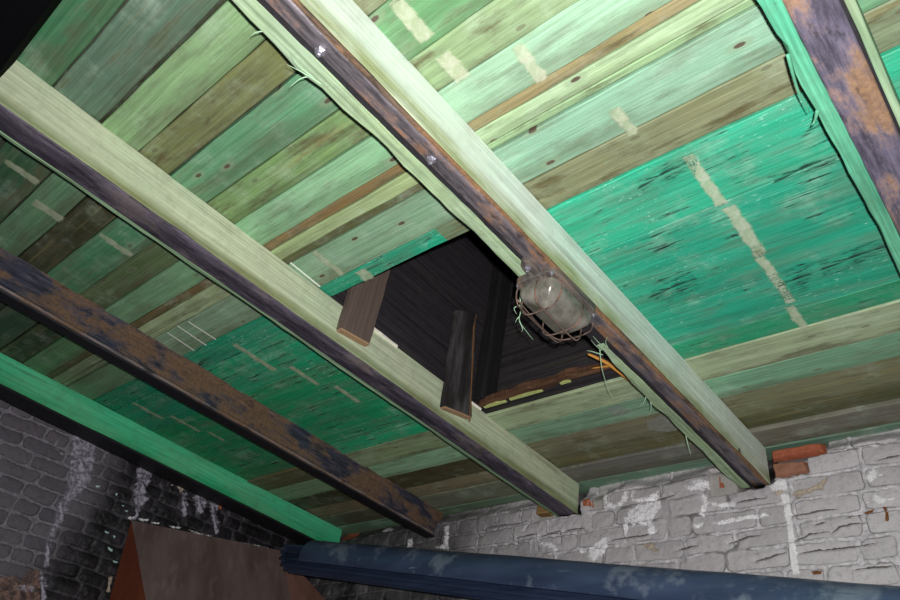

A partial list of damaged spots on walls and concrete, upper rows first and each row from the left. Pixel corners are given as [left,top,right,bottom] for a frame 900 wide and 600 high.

corrosion [291,0,770,486]
flaking render [772,443,827,478]
water stain [43,436,96,566]
water stain [128,467,159,524]
water stain [604,489,661,536]